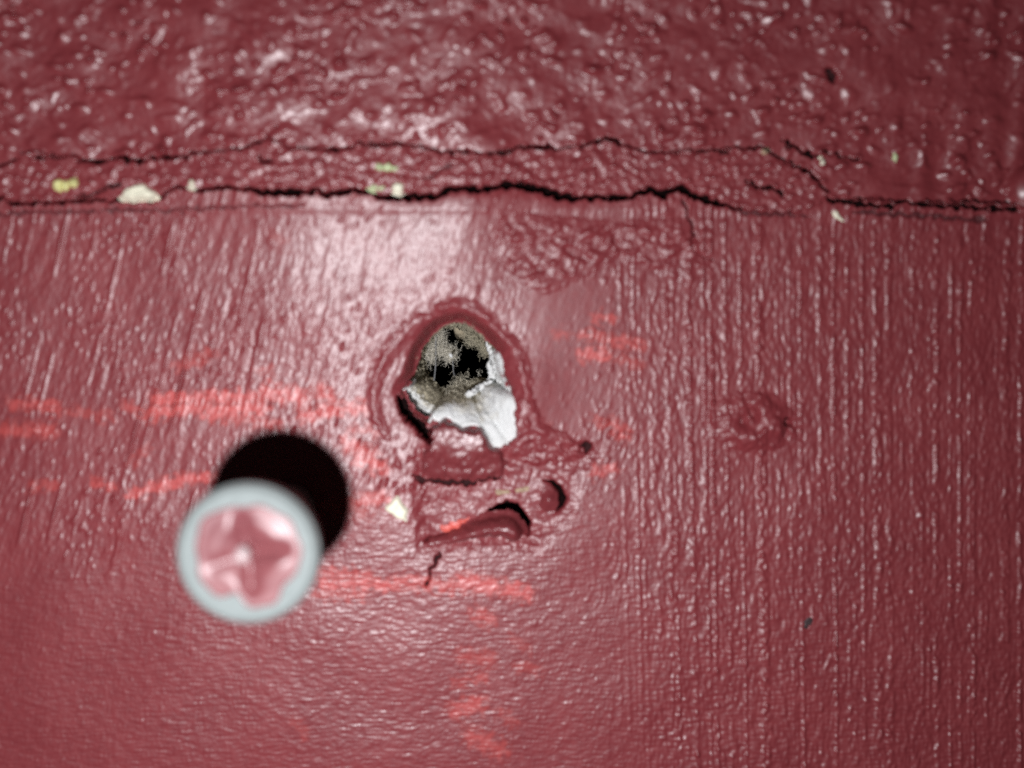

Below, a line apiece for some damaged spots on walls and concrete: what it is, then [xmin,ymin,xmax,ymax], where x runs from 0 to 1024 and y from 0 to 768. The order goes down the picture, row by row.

crack [0,126,784,235]
crack [673,139,1017,224]
hole [426,328,489,388]
peeling [385,495,408,522]
spalling [426,487,530,546]